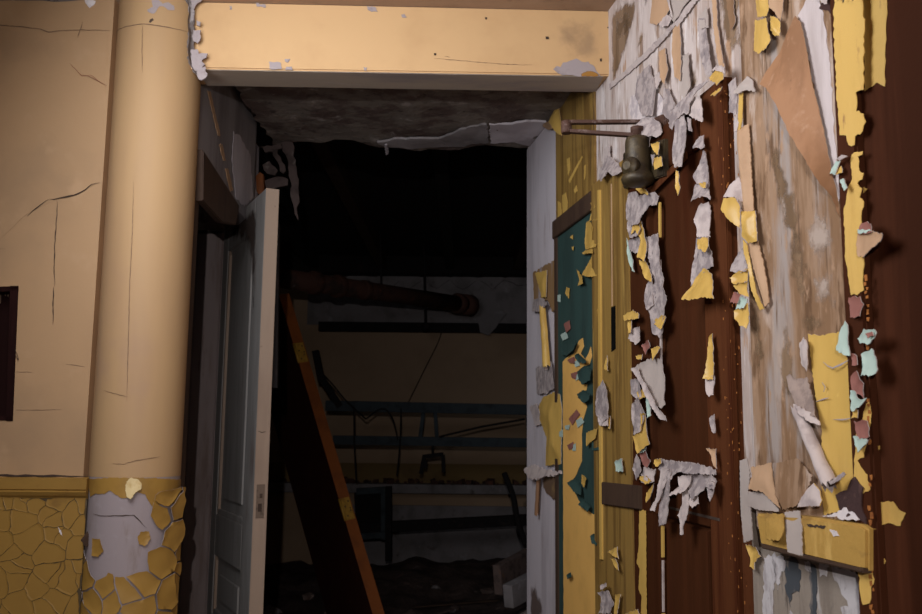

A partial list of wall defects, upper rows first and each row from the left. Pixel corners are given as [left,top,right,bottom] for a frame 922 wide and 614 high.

crack [1,0,208,81]
peeling [599,144,622,181]
crack [31,183,96,318]
peeling [609,0,888,535]
peeling [347,205,611,516]
crack [0,497,142,614]
peeling [80,477,186,614]
peeling [609,547,619,570]
peeling [597,583,639,614]
peeling [739,458,875,614]
peeling [881,501,906,526]